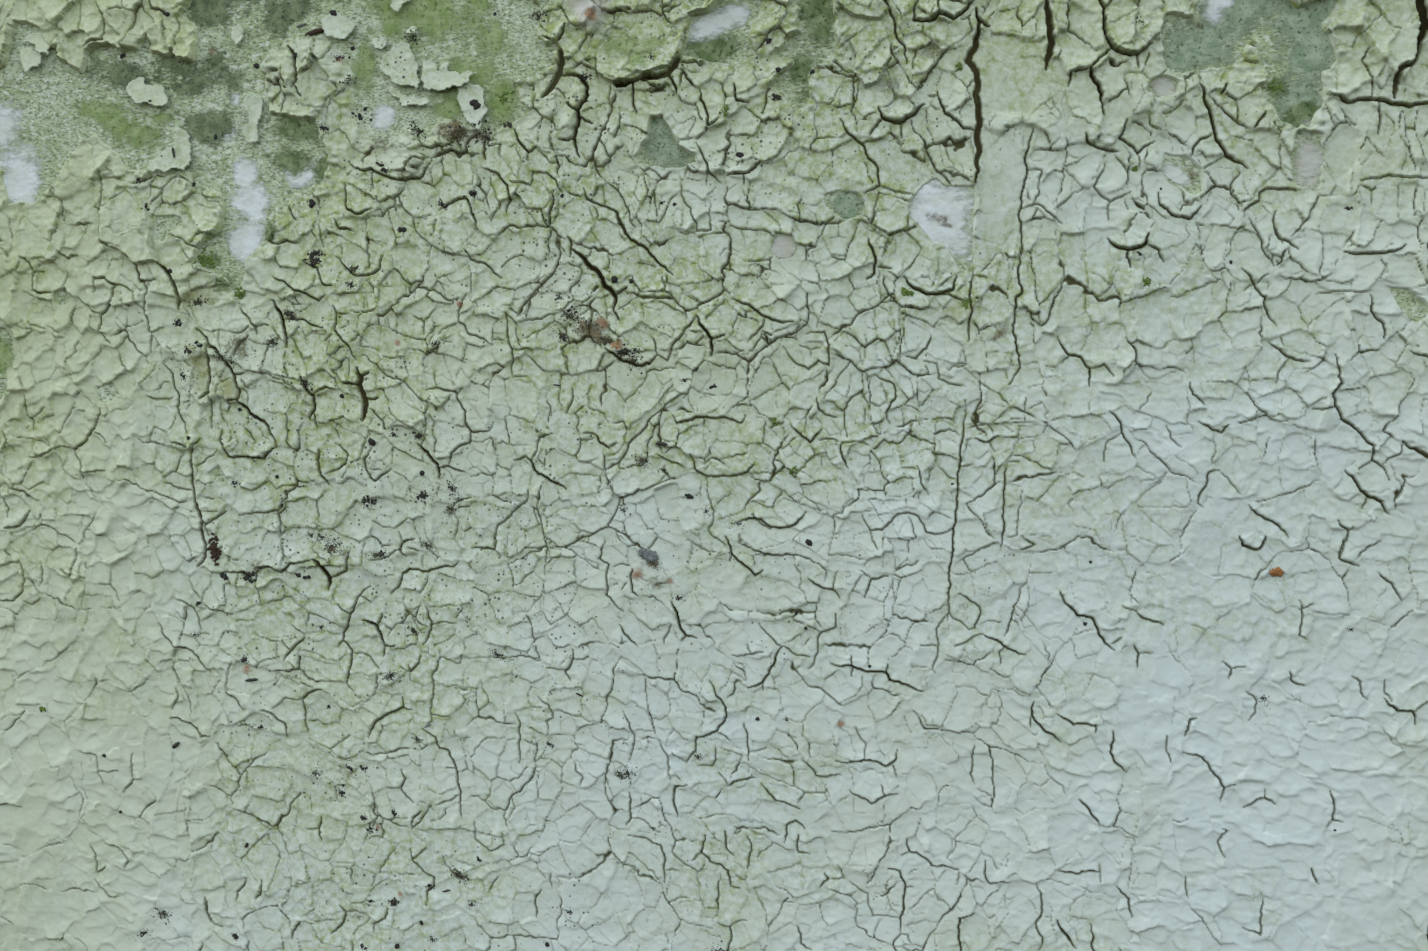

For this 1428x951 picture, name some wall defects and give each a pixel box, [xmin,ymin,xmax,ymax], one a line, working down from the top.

leakage [80,42,259,146]
leakage [188,0,349,41]
peeling [0,0,558,297]
leakage [351,99,516,168]
peeling [595,0,763,80]
peeling [774,0,891,109]
crack [855,15,987,164]
crack [1045,0,1128,101]
peeling [1107,0,1336,195]
crack [1406,0,1428,66]
leakage [227,156,270,263]
crack [581,255,617,310]